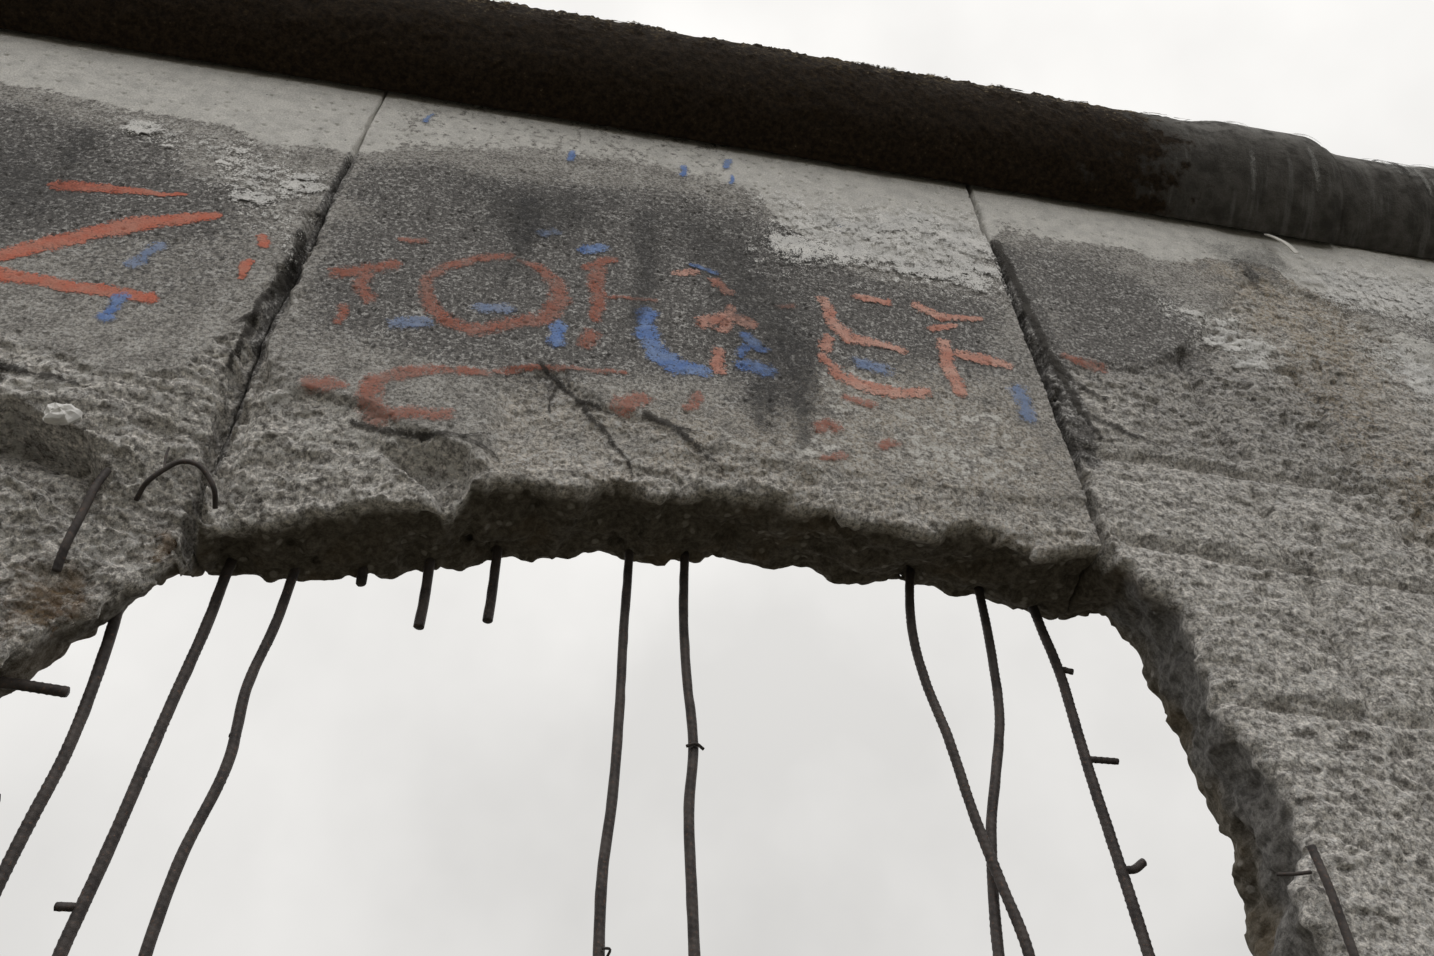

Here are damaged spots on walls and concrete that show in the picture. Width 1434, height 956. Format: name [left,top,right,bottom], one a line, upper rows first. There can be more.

corrosion [51,467,112,573]